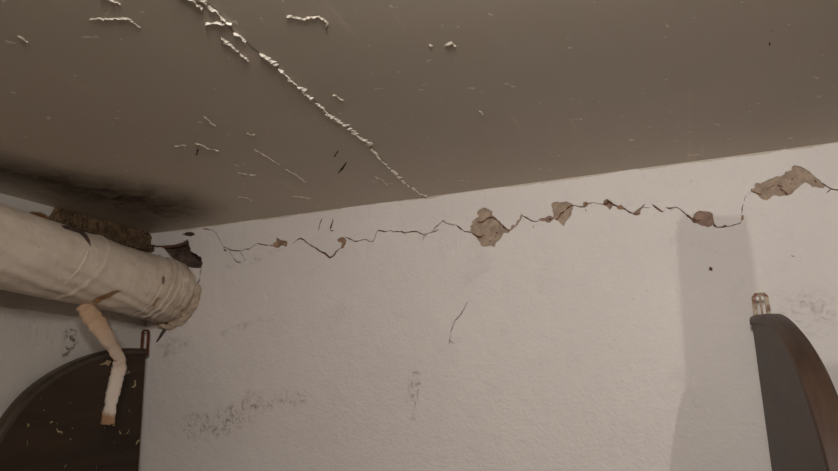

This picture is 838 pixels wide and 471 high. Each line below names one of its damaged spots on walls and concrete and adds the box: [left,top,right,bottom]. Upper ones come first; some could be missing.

damp [0,169,186,217]
crack [298,221,470,258]
flaking render [470,208,522,247]
flaking render [540,202,588,226]
crack [574,192,751,228]
flaking render [751,166,825,200]